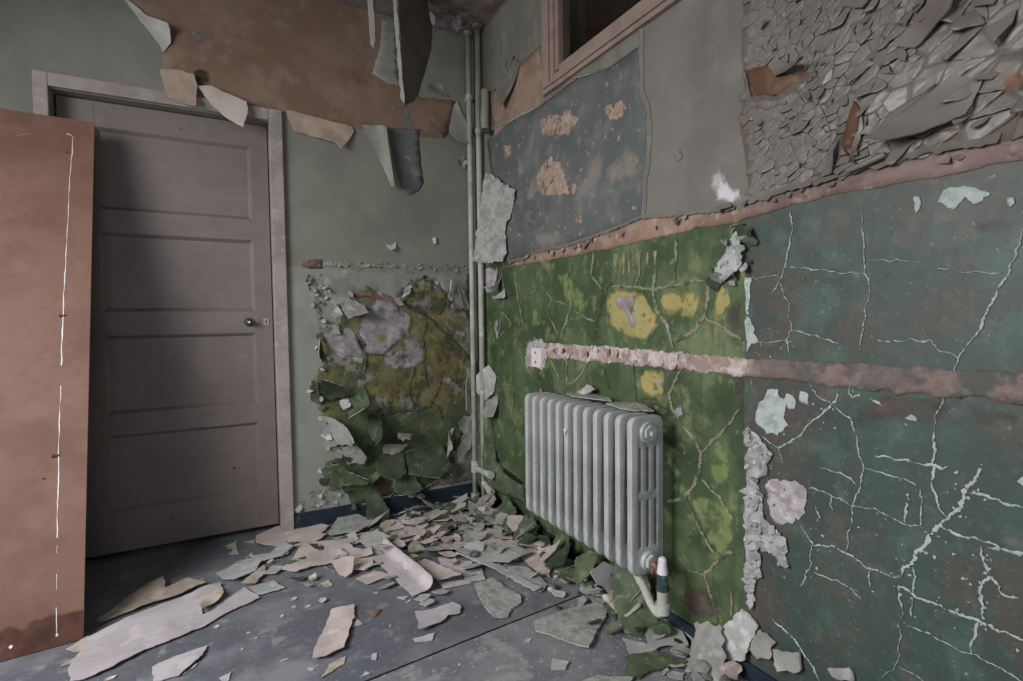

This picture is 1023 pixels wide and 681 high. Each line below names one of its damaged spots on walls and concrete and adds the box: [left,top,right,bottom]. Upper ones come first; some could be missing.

water stain [325,300,458,401]
peeling [125,0,1023,543]
water stain [640,371,664,396]
water stain [607,291,699,339]
water stain [715,284,740,328]
crack [495,206,1023,625]
spalling [722,389,834,673]
crack [762,382,1023,681]